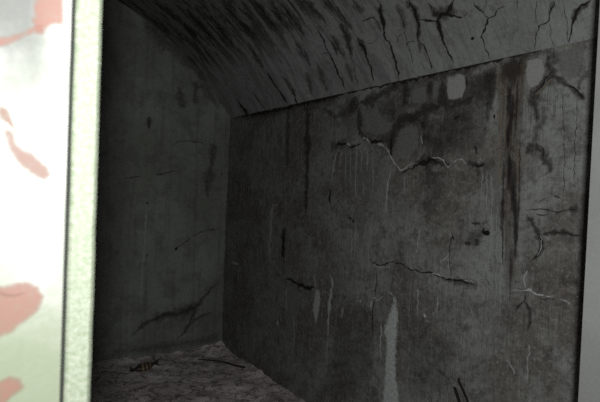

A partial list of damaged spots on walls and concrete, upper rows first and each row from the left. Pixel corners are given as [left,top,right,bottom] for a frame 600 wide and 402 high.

crack [236,0,590,117]
leakage [389,83,472,156]
crack [329,137,485,203]
crack [513,97,579,328]
crack [286,278,313,290]
crack [373,235,474,294]
efflorescence [370,291,398,402]